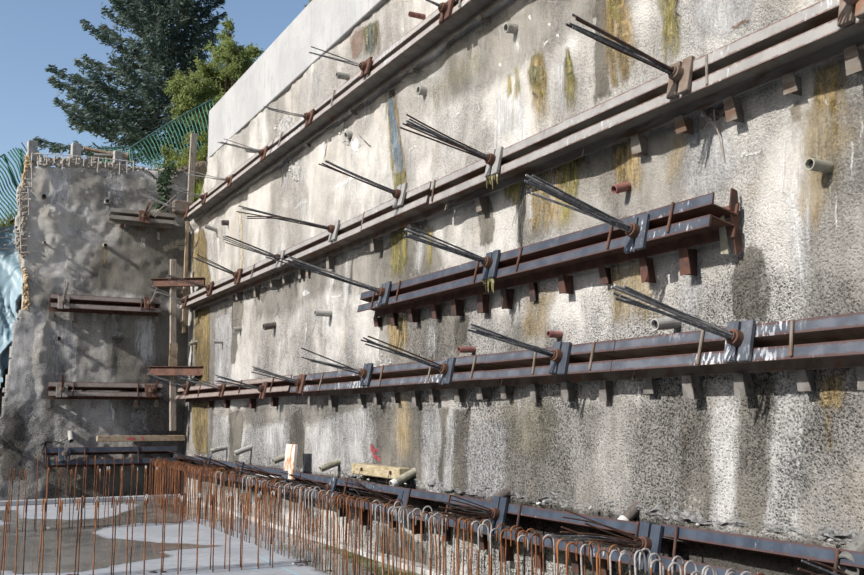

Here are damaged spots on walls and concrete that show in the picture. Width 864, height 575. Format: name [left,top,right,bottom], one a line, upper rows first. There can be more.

damp [447,0,632,105]
damp [387,91,406,189]
damp [50,169,226,298]
damp [104,220,442,386]
damp [732,247,769,320]
damp [782,94,864,318]
damp [1,278,78,481]